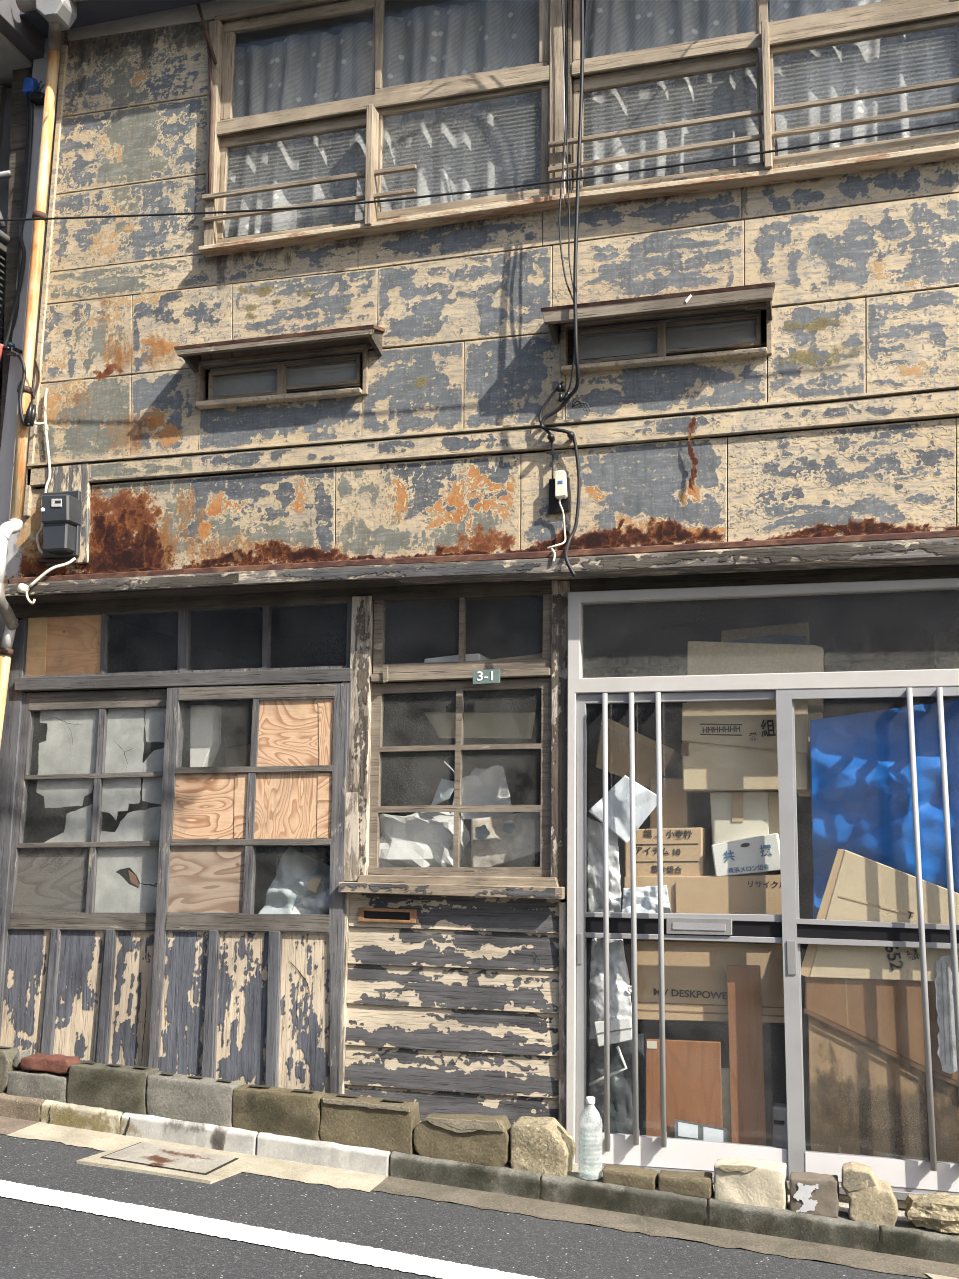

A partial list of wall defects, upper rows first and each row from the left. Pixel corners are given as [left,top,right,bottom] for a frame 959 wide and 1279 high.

peeling [5,24,959,594]
rust [5,454,726,580]
rust [680,416,700,506]
rust [742,516,959,541]
peeling [111,594,568,1133]
peeling [3,930,103,1068]